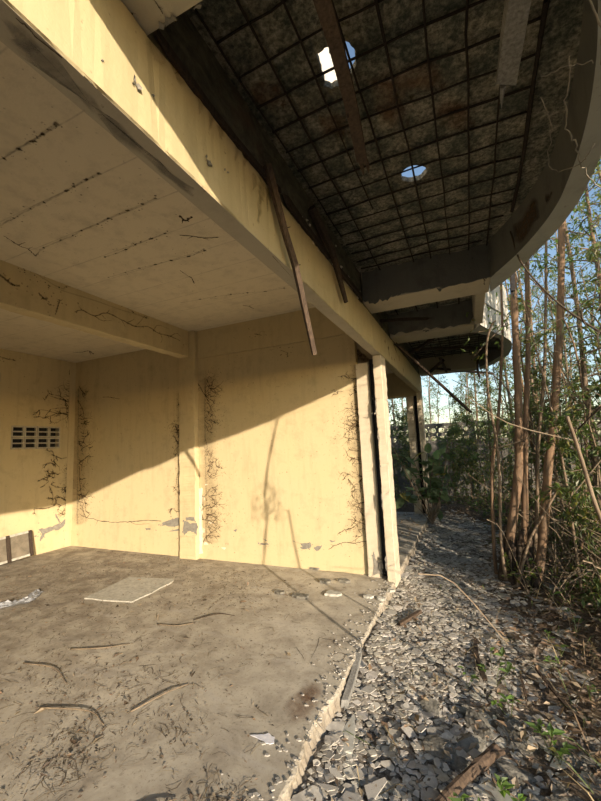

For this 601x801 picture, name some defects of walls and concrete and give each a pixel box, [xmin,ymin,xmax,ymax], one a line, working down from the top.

spalling [192,0,550,304]
crack [179,215,219,240]
spalling [388,298,490,360]
peeling [34,514,65,541]
peeling [145,484,212,554]
peeling [294,540,335,551]